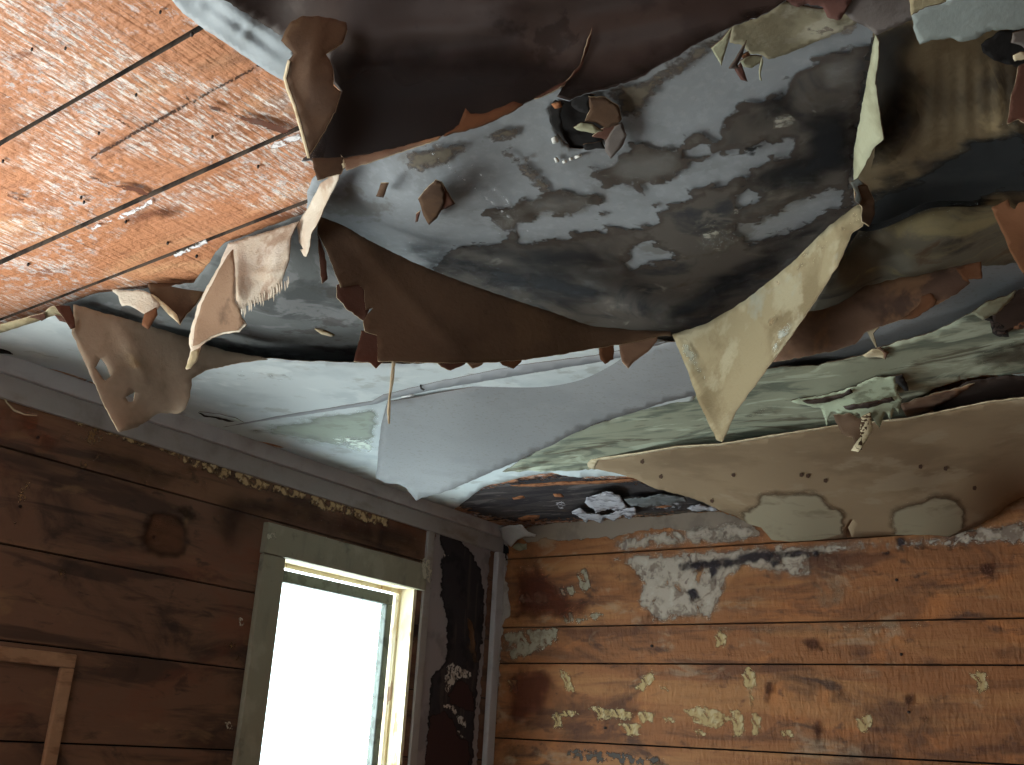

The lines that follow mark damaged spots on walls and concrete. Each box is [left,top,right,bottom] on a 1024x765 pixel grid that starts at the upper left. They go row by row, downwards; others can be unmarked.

peeling [1011,29,1024,61]
spalling [209,106,291,134]
leakage [407,25,913,341]
peeling [159,448,400,526]
peeling [420,535,485,765]
peeling [589,706,641,737]
peeling [751,713,761,735]